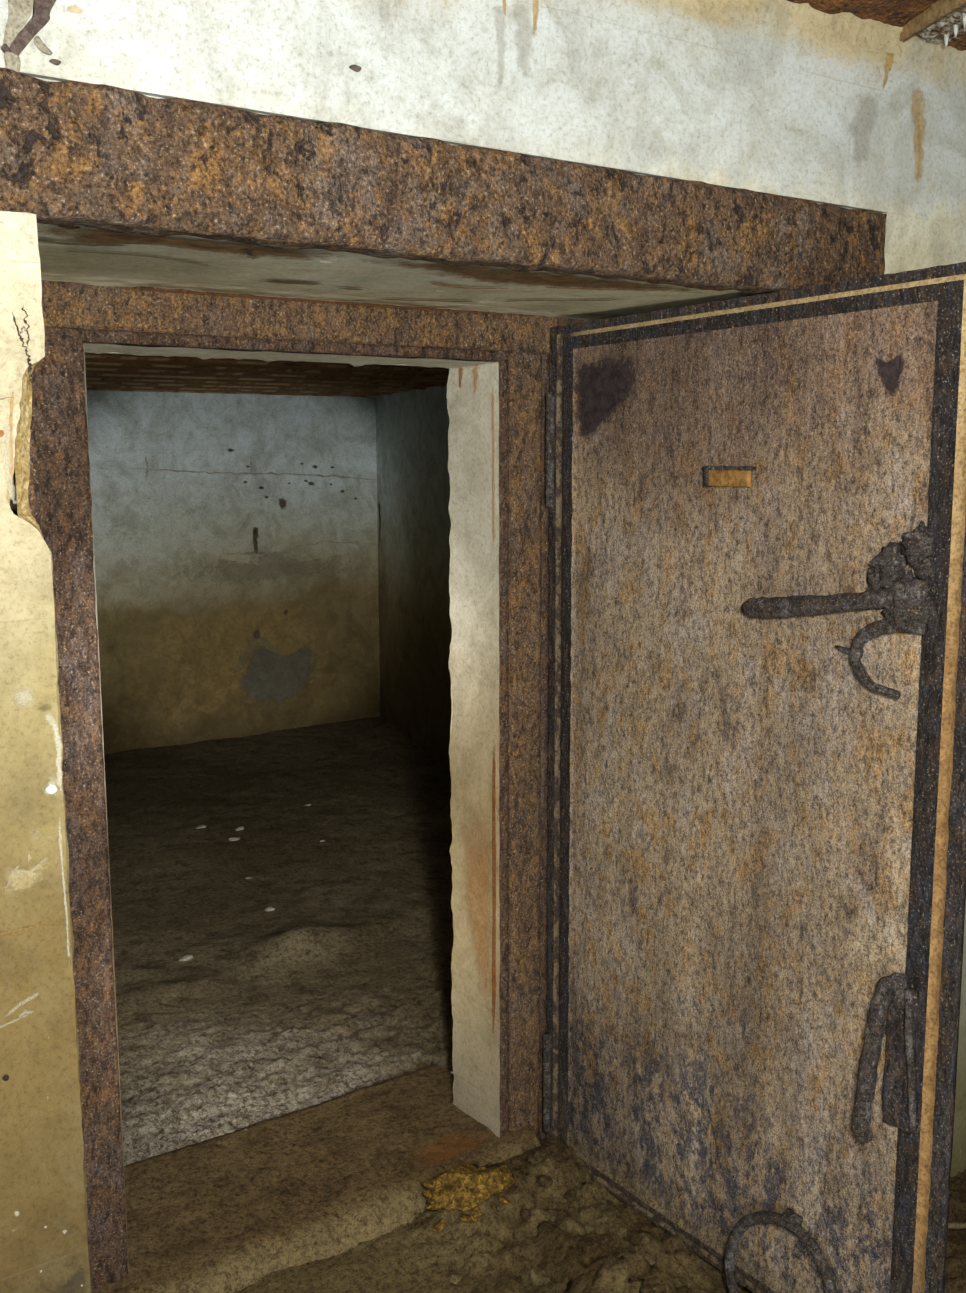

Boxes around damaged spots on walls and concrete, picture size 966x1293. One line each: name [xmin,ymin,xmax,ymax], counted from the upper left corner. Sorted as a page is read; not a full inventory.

corrosion [912,92,925,178]
spalling [4,360,45,541]